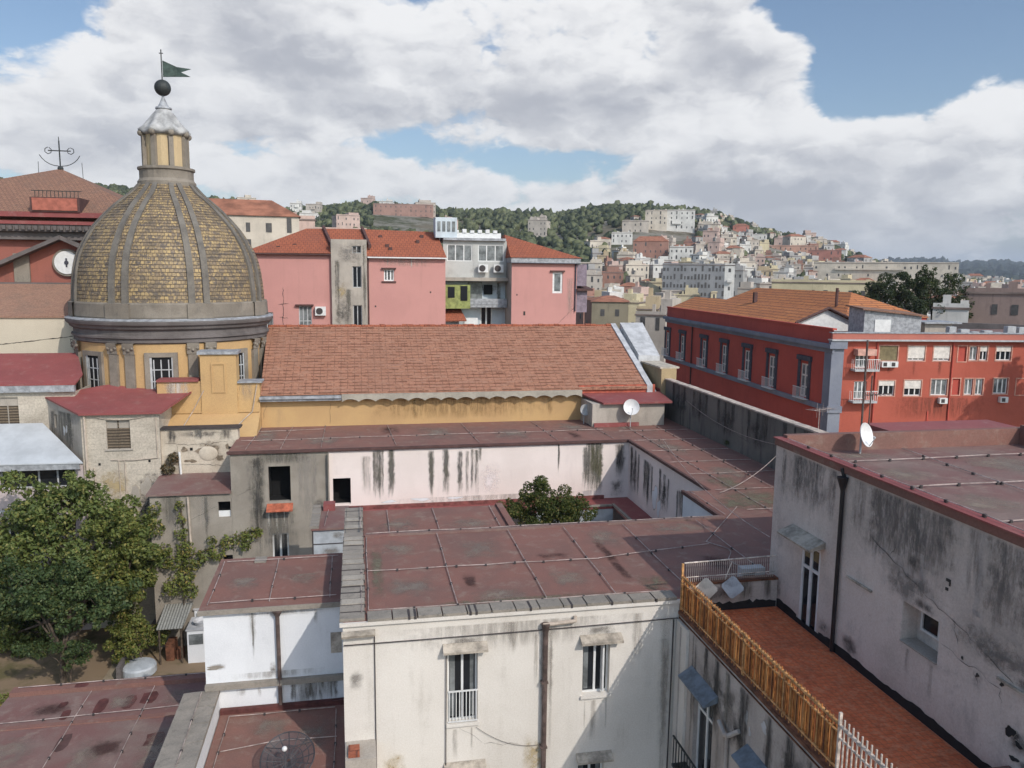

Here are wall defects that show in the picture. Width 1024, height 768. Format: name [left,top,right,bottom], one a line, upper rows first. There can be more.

leakage [252,453,300,543]
leakage [373,450,394,488]
leakage [429,448,481,486]
leakage [584,443,602,481]
leakage [616,445,683,517]
leakage [874,491,941,566]
leakage [695,648,748,749]
leakage [785,739,796,768]